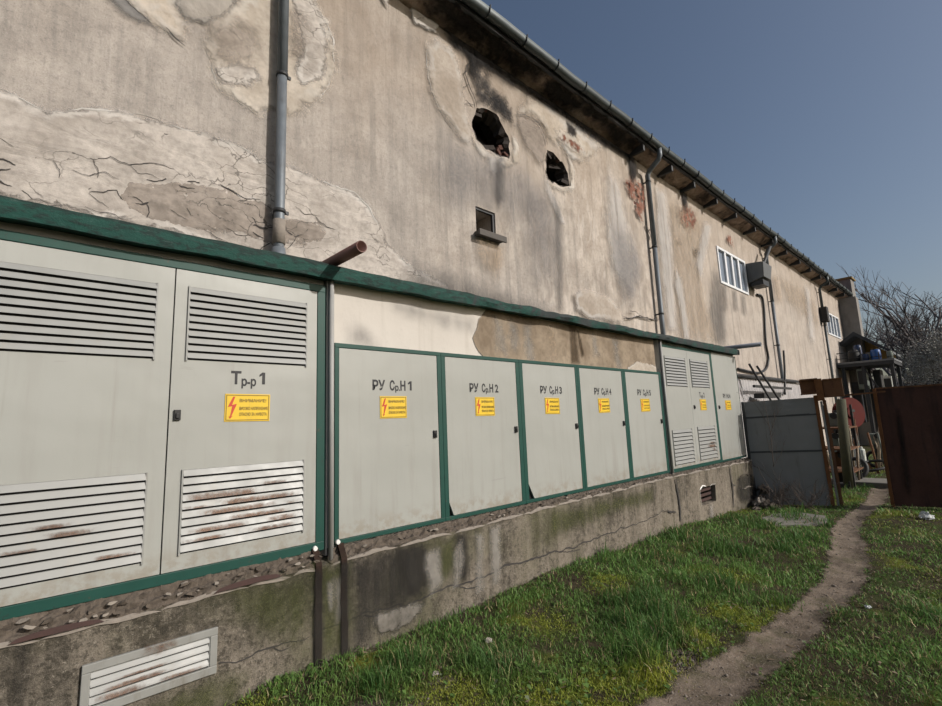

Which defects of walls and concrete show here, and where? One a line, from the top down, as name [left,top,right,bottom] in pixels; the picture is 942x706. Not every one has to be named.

peeling [114,0,335,115]
peeling [409,8,599,224]
crack [0,138,333,249]
spalling [626,180,646,221]
peeling [473,290,656,369]
corrosion [196,490,292,540]
spalling [0,457,757,649]
damp [355,549,441,644]
crack [219,479,688,664]
damp [455,528,500,586]